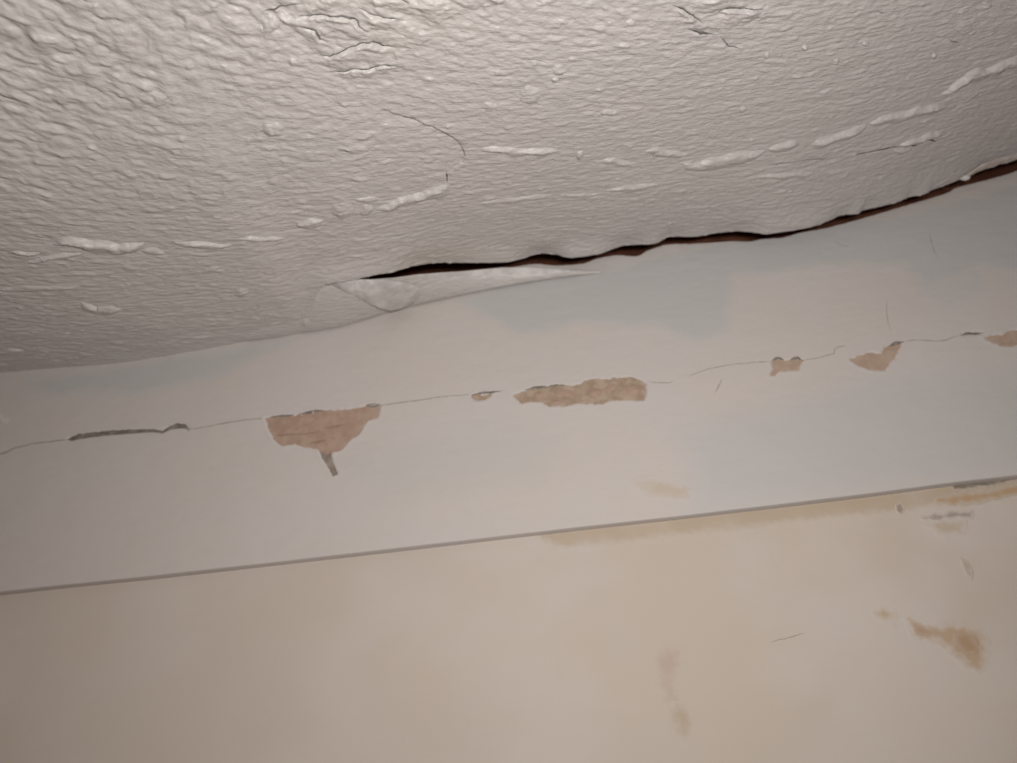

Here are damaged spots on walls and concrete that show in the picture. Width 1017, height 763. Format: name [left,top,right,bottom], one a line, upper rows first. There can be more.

flaking render [689,346,843,376]
flaking render [849,335,961,371]
flaking render [985,330,1017,347]
flaking render [513,377,672,407]
crack [0,418,265,455]
flaking render [266,391,501,476]